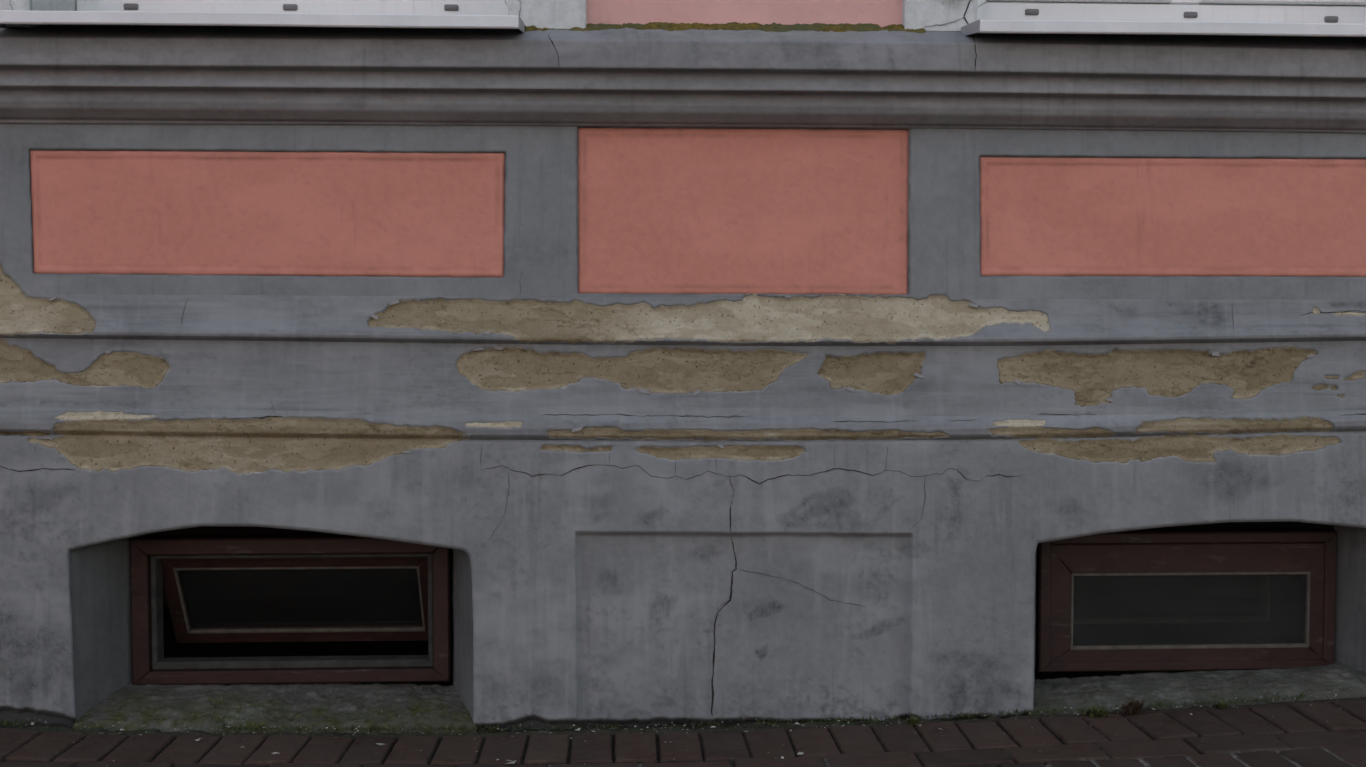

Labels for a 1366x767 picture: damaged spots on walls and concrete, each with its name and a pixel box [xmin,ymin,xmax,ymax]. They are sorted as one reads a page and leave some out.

peeling [0,265,170,388]
peeling [367,293,1050,396]
peeling [997,347,1318,407]
peeling [0,411,522,474]
crack [542,412,743,420]
peeling [540,427,948,461]
peeling [989,417,1341,463]
crack [480,420,1020,716]